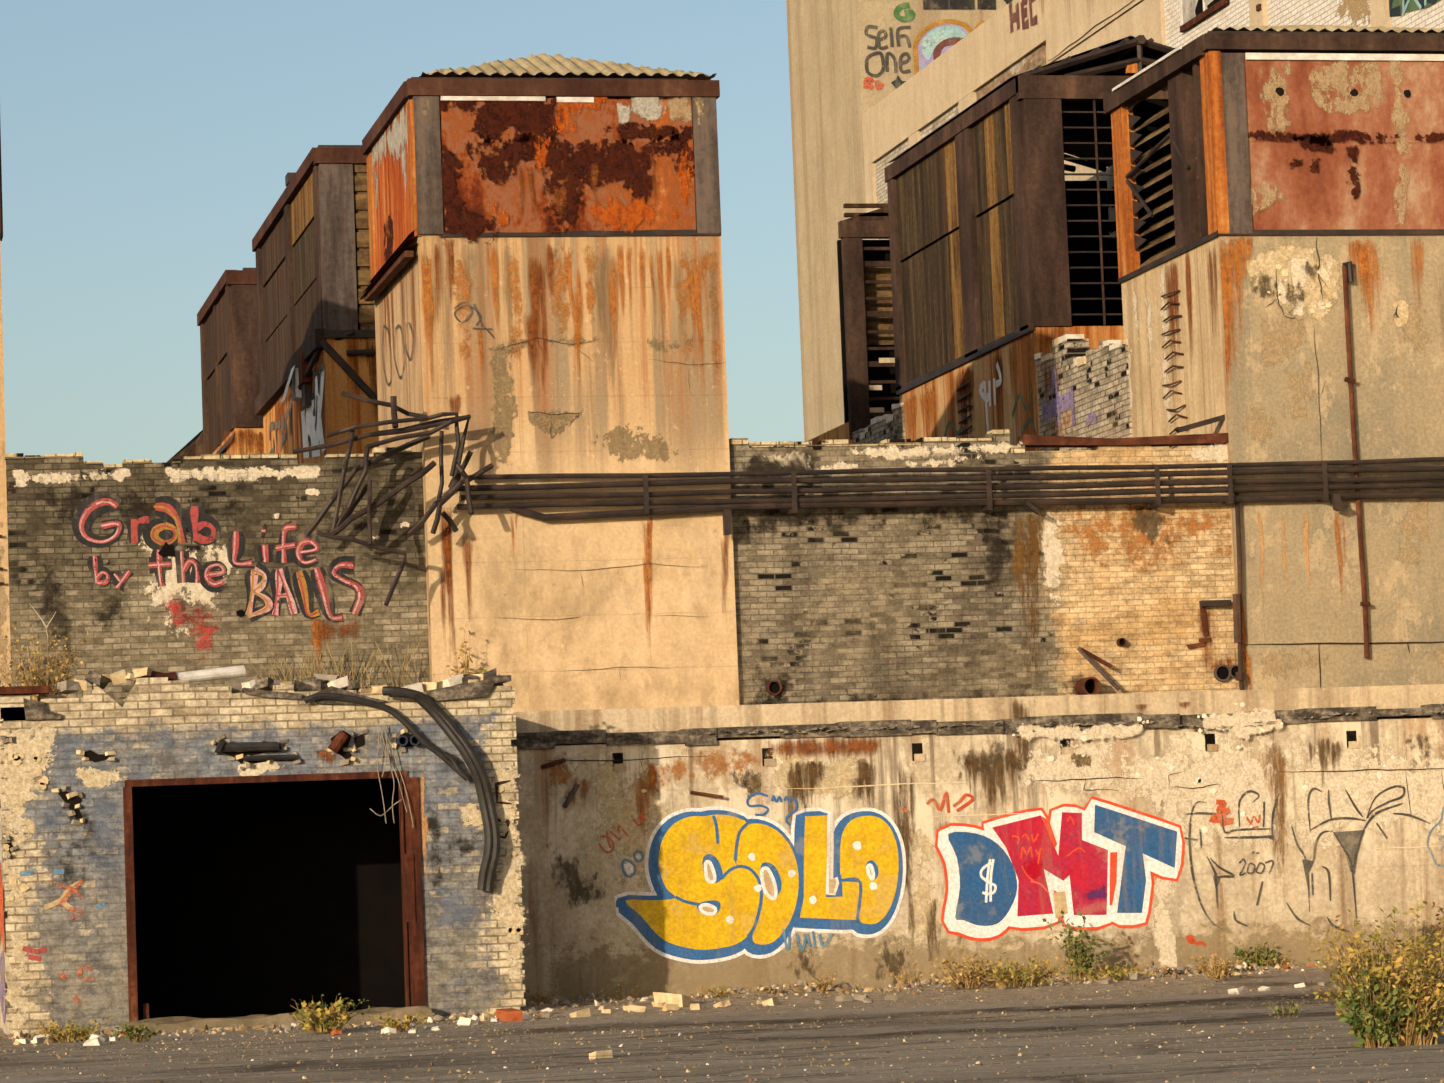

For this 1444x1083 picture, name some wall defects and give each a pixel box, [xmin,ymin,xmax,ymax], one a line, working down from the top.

rust [353,96,719,414]
rust [1166,253,1192,350]
peeling [1243,244,1342,420]
rust [1208,53,1444,376]
spalling [488,334,602,463]
spalling [594,424,678,463]
rust [644,519,652,622]
leakage [788,762,823,806]
leakage [855,760,874,800]
leakage [959,737,1028,804]
spalling [0,720,126,1035]
leakage [893,771,936,949]